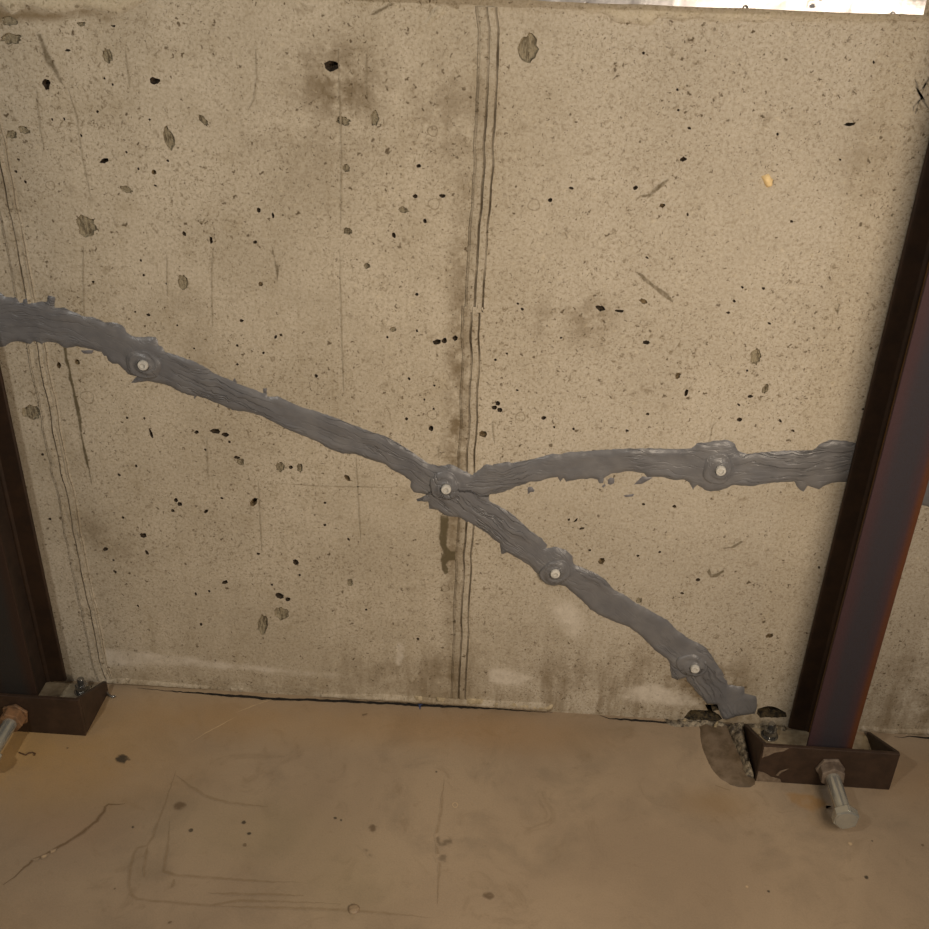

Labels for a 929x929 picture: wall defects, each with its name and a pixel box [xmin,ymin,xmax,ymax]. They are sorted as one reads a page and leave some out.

crack [258,456,391,547]
leakage [439,515,455,575]
crack [143,688,545,713]
spalling [684,704,722,722]
spalling [757,706,787,718]